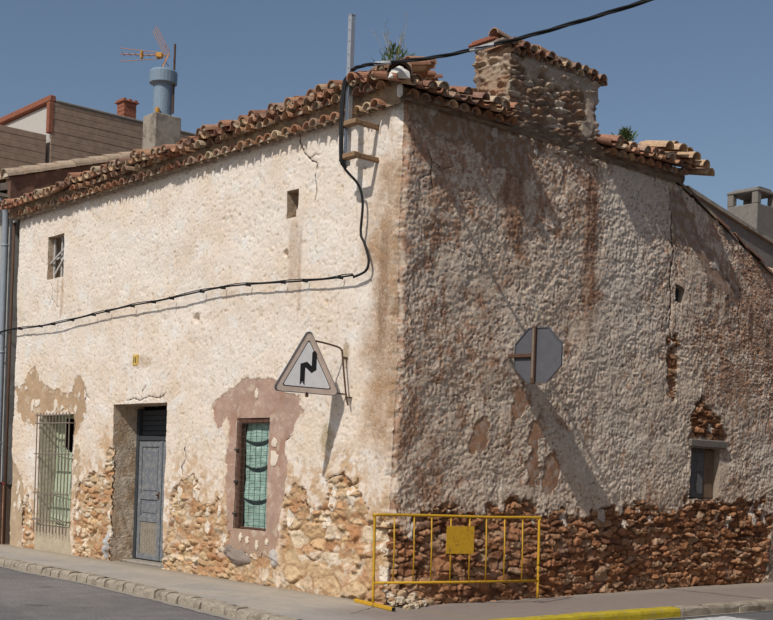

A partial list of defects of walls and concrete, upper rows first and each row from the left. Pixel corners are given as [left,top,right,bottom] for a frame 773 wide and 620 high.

crack [300,136,318,198]
crack [668,190,678,338]
flaking render [666,334,680,401]
peeling [10,458,35,549]
flaking render [15,366,115,561]
flaking render [162,377,773,605]